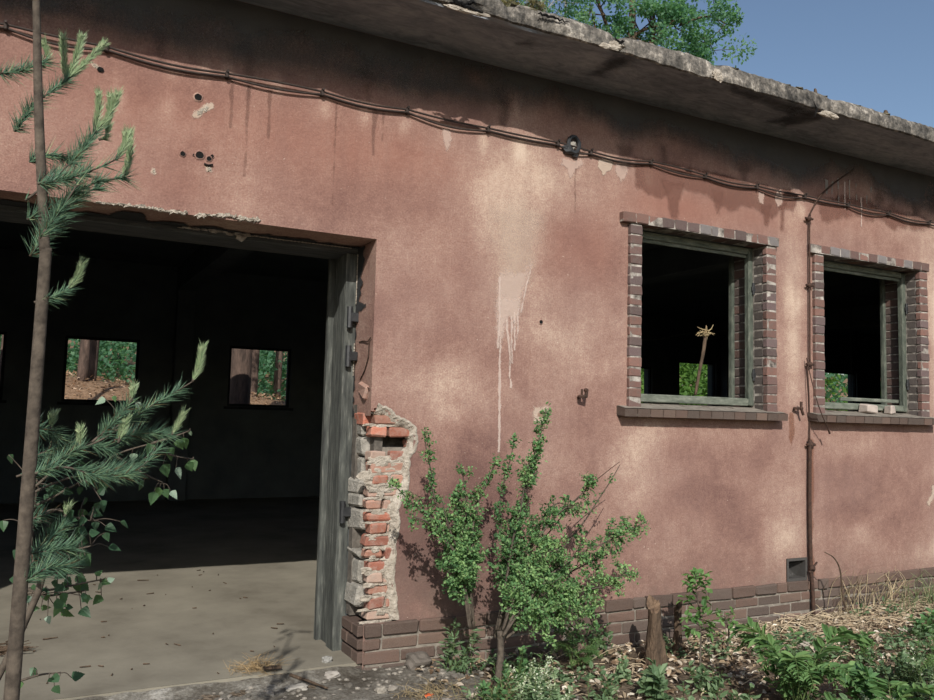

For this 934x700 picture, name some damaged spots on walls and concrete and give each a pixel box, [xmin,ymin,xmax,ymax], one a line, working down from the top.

spalling [94,201,268,242]
leakage [0,0,934,230]
leakage [497,270,531,452]
spalling [344,381,419,624]